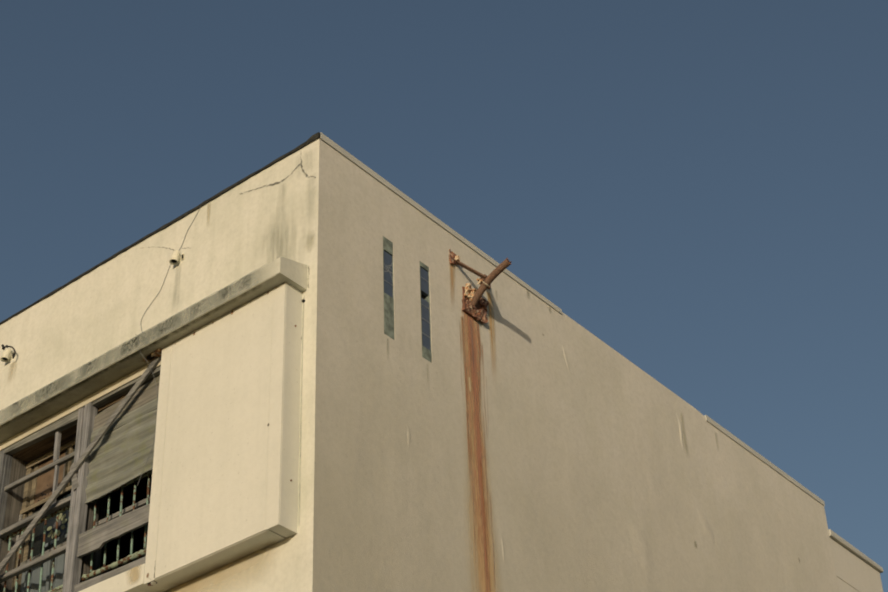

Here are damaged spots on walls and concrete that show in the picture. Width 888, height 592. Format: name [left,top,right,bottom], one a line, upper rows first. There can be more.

crack [240,157,316,194]
water stain [0,271,255,426]
rust [460,312,495,592]